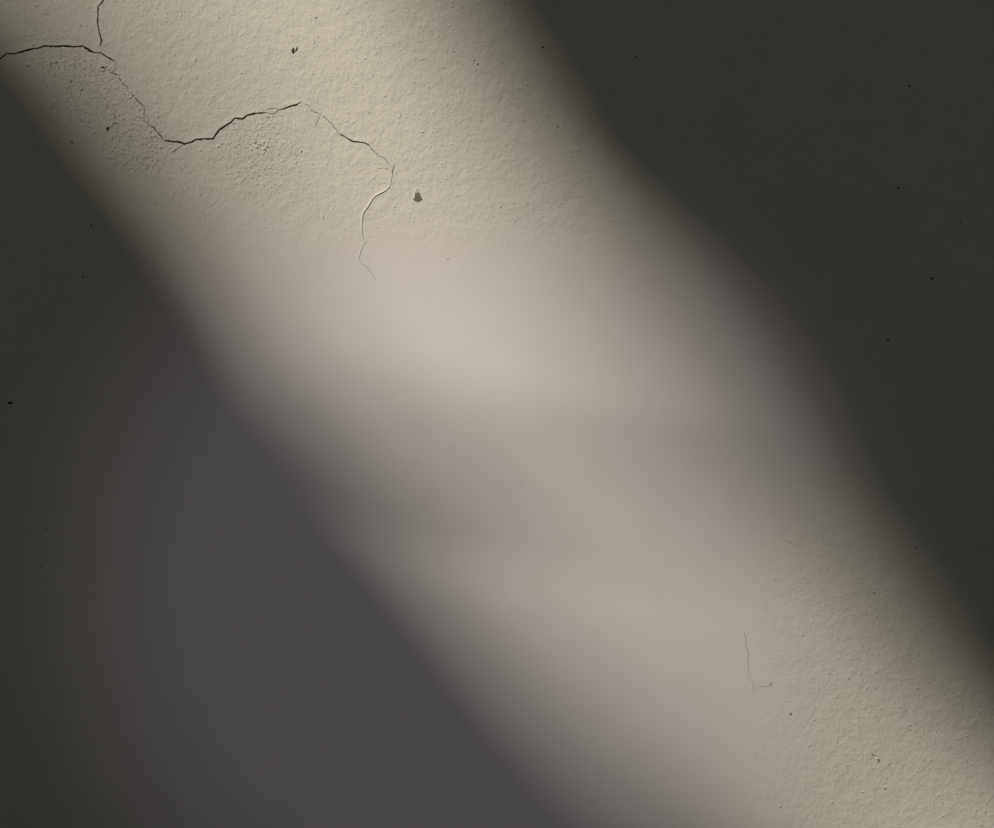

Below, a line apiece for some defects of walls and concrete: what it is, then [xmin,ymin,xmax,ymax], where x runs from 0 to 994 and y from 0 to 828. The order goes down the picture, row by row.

crack [0,0,394,282]